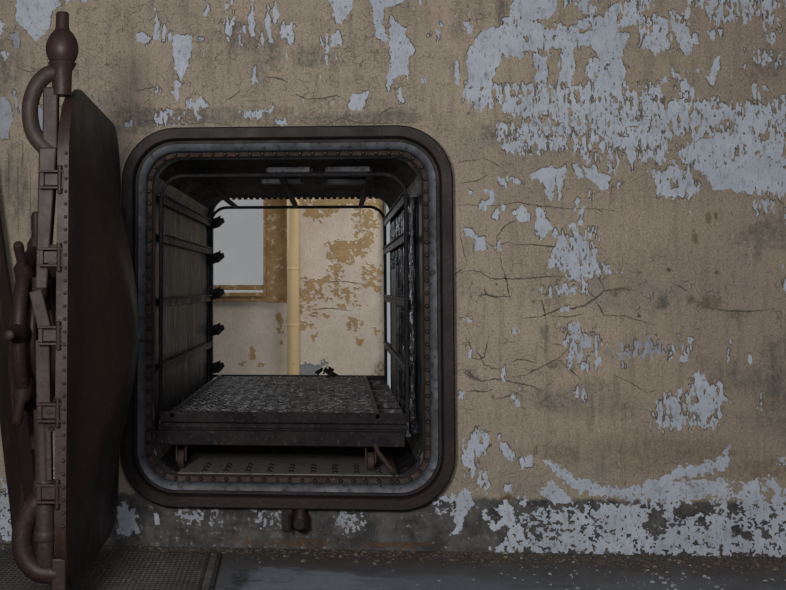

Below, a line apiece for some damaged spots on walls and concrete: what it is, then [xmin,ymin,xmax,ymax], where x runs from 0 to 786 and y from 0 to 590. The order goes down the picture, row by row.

peeling [0,0,87,62]
peeling [136,7,210,127]
peeling [222,0,297,49]
peeling [370,0,416,105]
crack [458,159,501,184]
peeling [453,0,786,372]
peeling [299,197,384,346]
crack [454,201,618,298]
crack [462,272,657,410]
peeling [650,370,729,436]
peeling [0,476,12,542]
peeling [432,425,786,557]